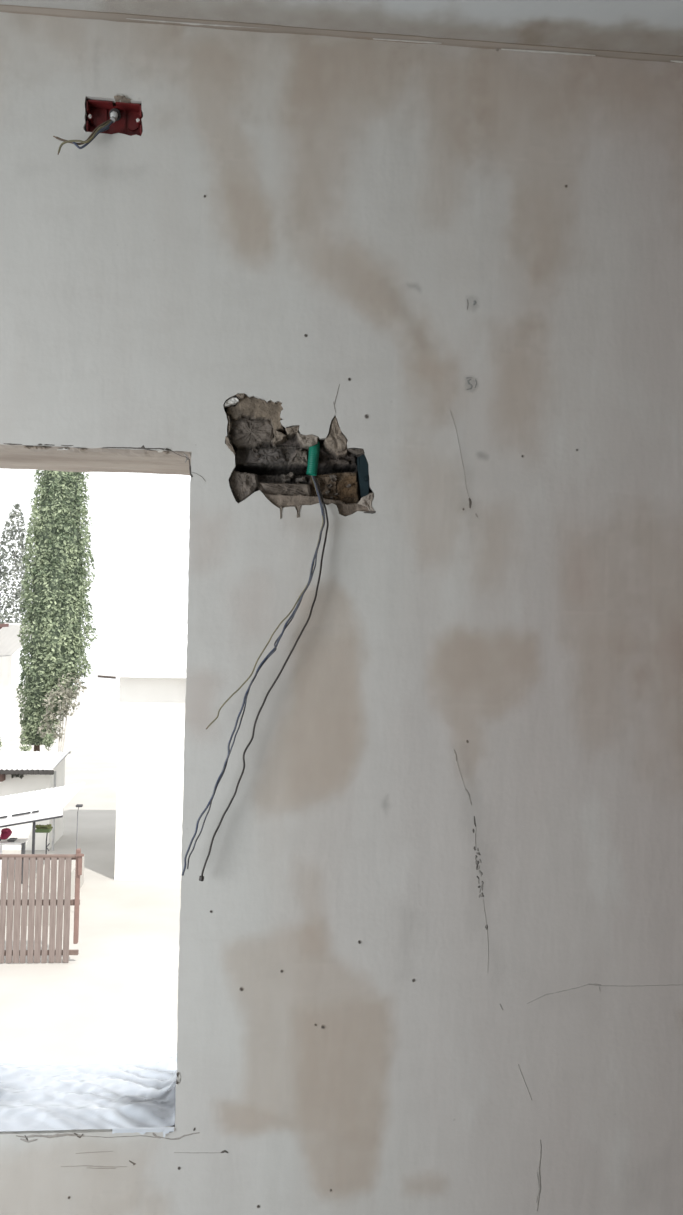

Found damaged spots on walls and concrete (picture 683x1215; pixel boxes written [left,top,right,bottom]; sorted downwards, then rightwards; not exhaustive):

flaking render [224,393,376,519]
crack [450,411,478,518]